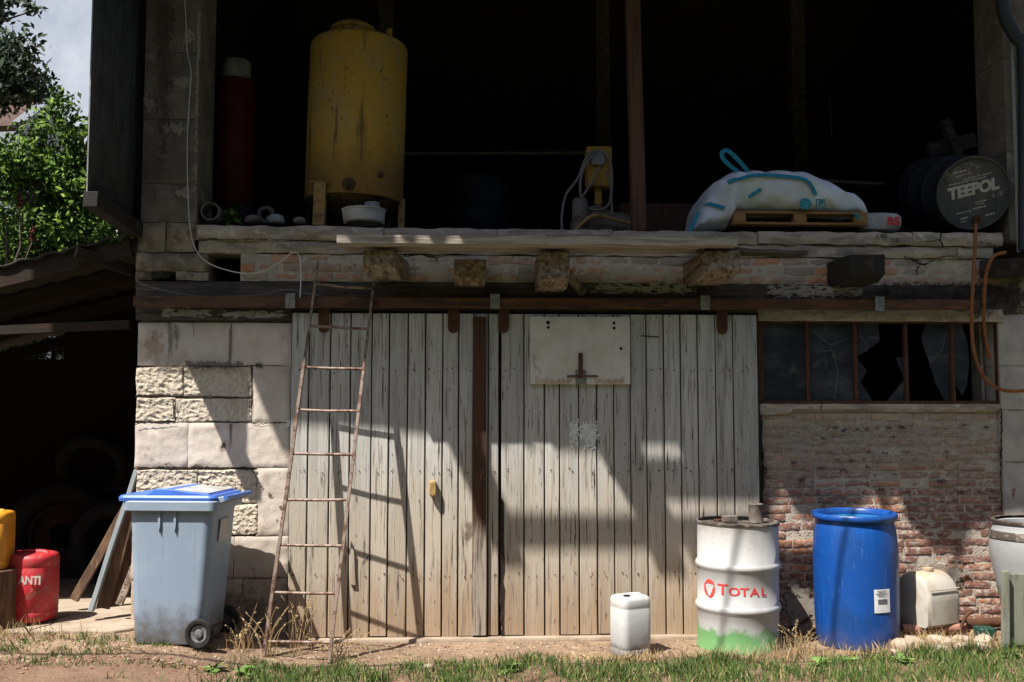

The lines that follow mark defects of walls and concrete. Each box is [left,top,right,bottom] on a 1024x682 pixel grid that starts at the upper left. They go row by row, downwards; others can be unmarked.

crack [904,231,966,277]
peeling [568,414,600,450]
peeling [910,558,972,584]
peeling [782,578,815,634]